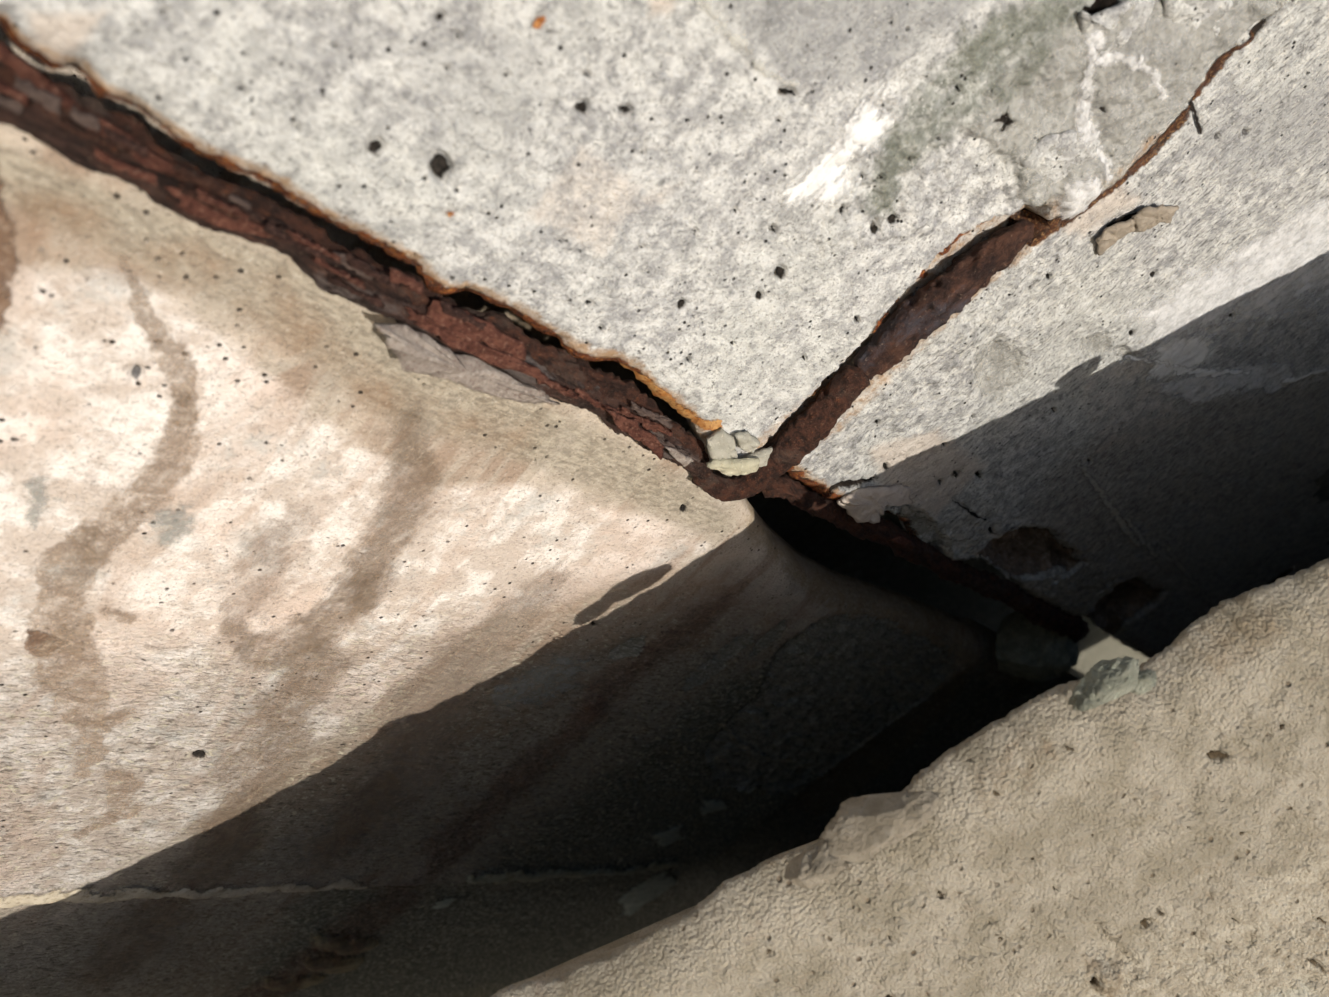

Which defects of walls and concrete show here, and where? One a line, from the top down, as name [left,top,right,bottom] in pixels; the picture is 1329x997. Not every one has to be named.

crack [1007,14,1272,247]
rust [0,16,722,480]
rust [938,221,986,256]
rust [24,278,199,838]
crack [828,476,873,492]
rust [762,466,1090,643]
crack [954,501,986,521]
spalling [976,527,1080,576]
spalling [1086,577,1162,635]
damp [81,413,435,982]